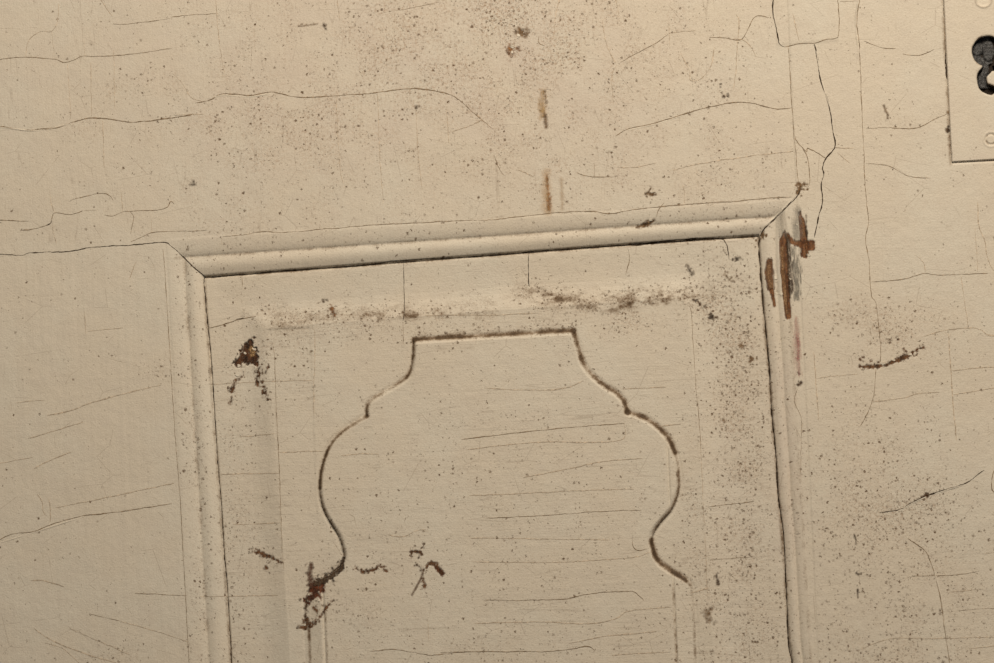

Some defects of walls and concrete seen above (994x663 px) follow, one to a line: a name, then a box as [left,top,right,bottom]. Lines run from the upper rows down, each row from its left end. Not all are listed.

crack [0,0,489,191]
crack [4,193,204,276]
crack [658,304,754,510]
crack [461,423,650,563]
crack [879,470,994,513]
crack [862,539,994,663]